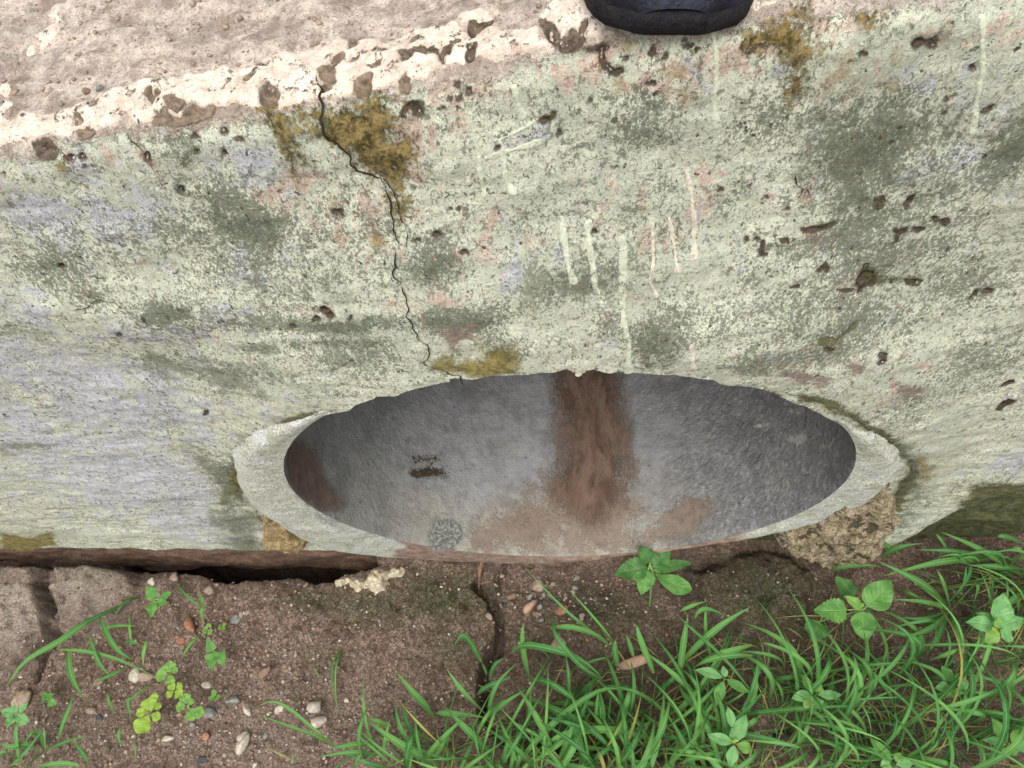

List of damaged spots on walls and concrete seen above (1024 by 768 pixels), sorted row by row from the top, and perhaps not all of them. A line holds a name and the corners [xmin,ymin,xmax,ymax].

crack [268,77,464,385]